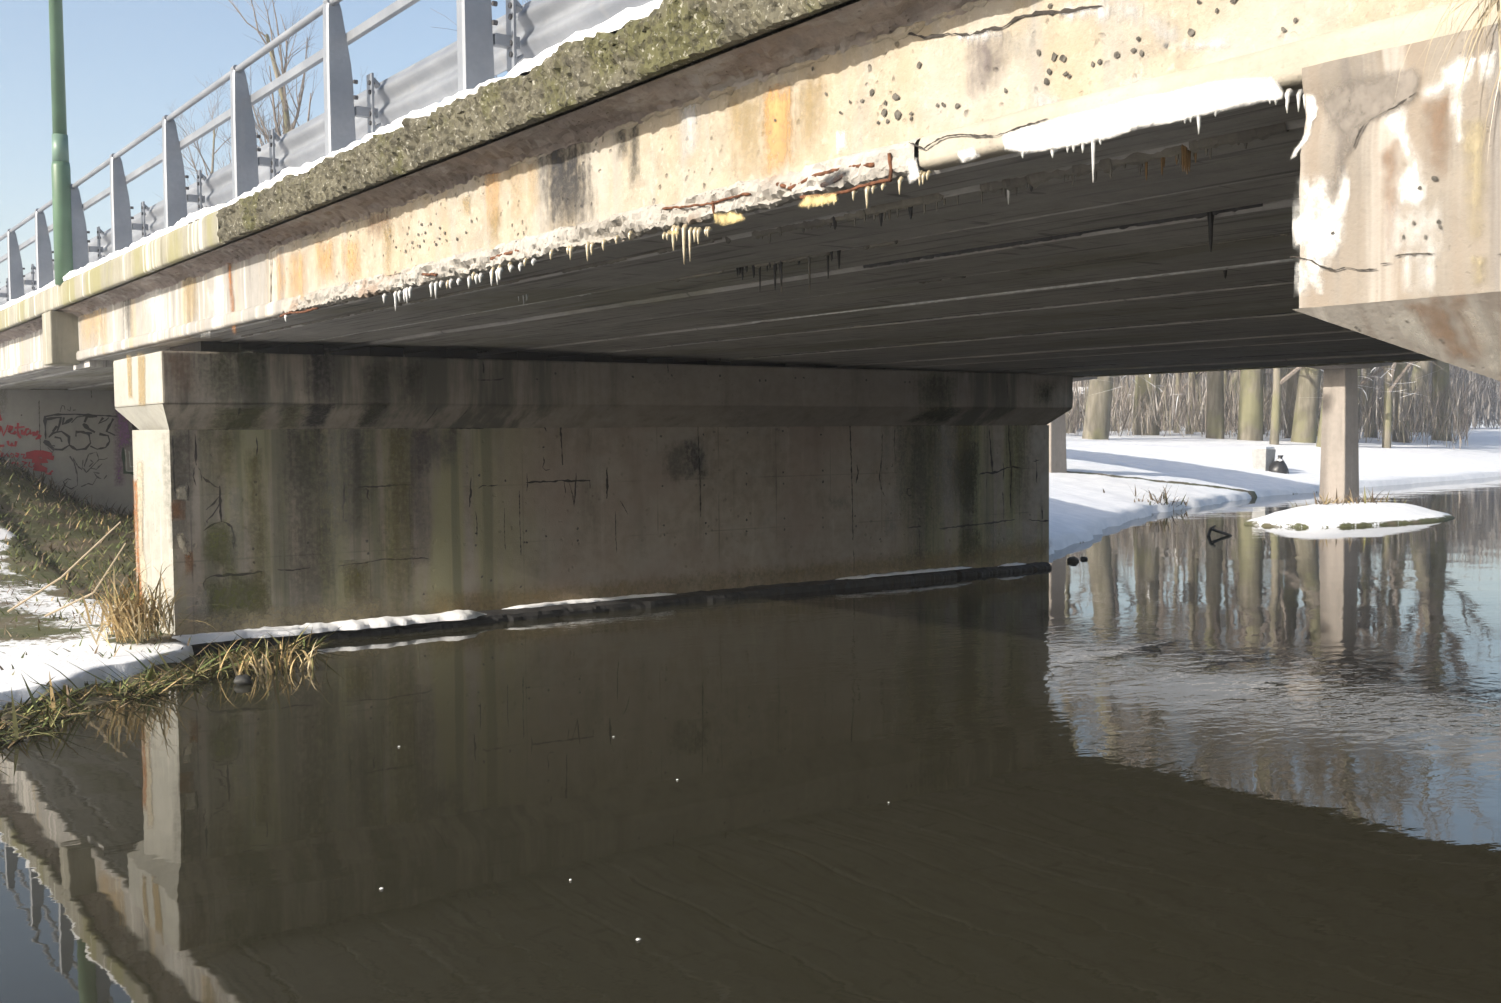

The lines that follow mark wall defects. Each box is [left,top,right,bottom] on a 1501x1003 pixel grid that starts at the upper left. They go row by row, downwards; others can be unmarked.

crack [907,5,1103,39]
water stain [540,144,589,221]
spalling [270,89,926,317]
corrosion [765,88,791,165]
water stain [958,149,976,161]
water stain [1003,78,1282,151]
water stain [980,95,1317,205]
spalling [1323,69,1419,194]
crack [1290,253,1435,271]
water stain [204,161,1377,581]
water stain [171,433,191,514]
water stain [195,564,380,632]